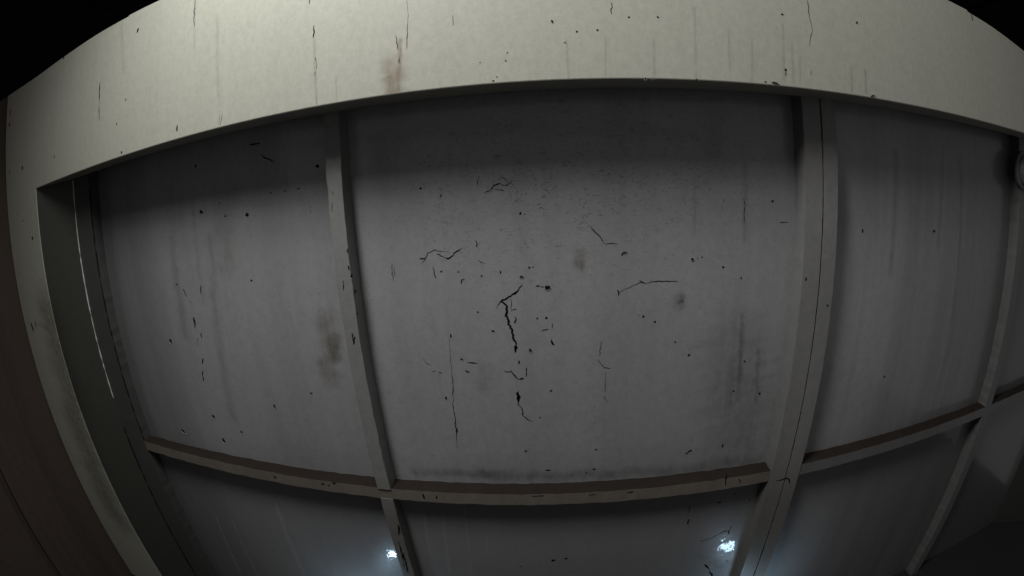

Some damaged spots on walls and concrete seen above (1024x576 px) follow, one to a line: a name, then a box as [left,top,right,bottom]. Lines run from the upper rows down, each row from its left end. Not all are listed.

crack [477,177,514,192]
crack [419,240,483,278]
crack [432,342,474,440]
crack [497,285,528,420]